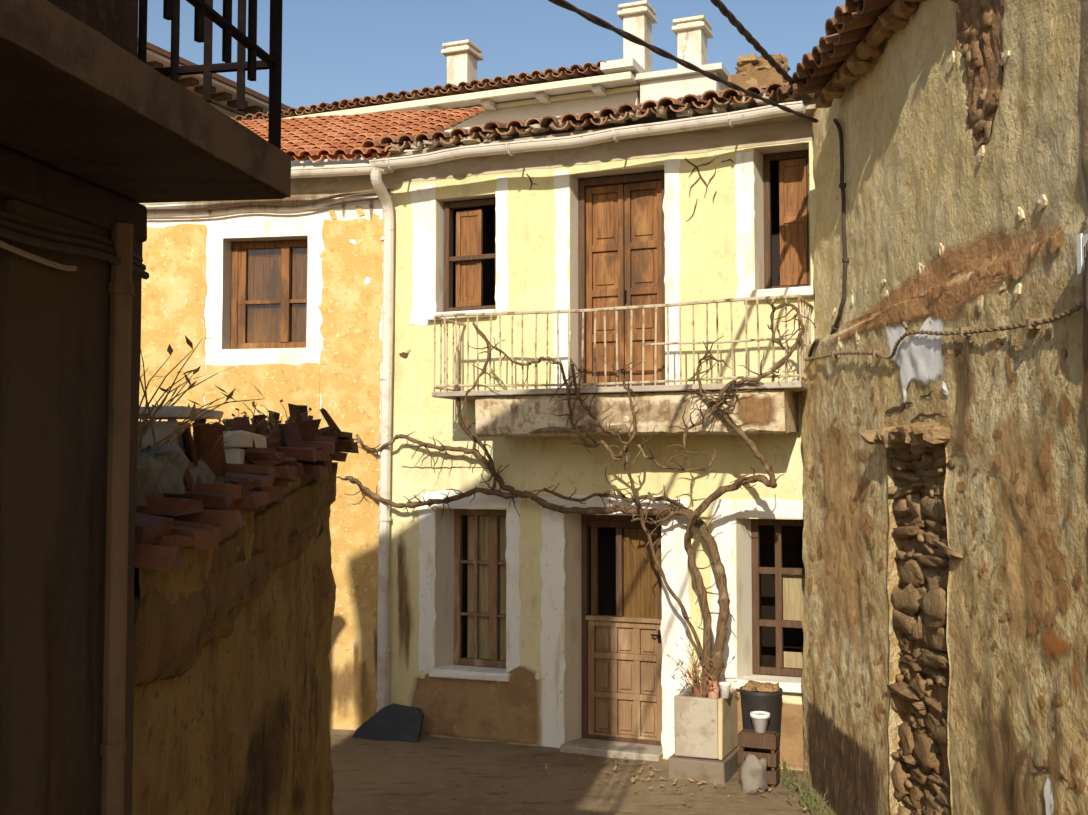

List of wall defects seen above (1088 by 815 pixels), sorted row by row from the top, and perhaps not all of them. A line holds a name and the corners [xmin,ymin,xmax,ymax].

flaking render [946,0,1010,167]
crack [685,158,733,221]
water stain [314,646,365,738]